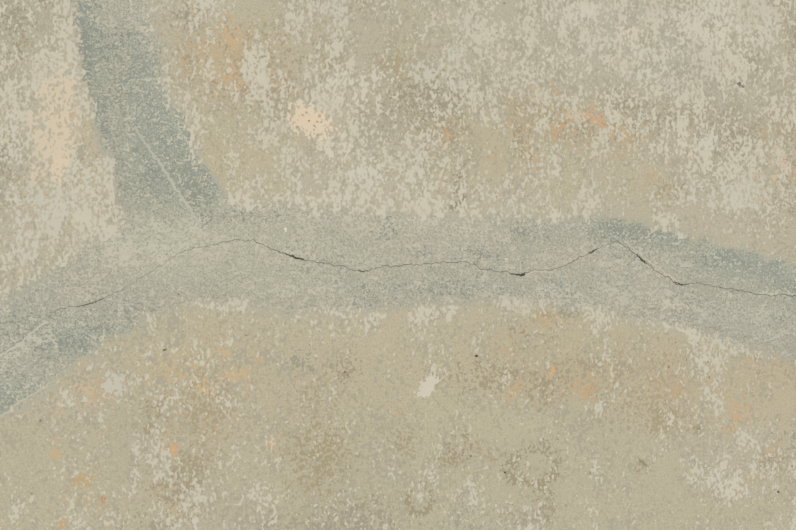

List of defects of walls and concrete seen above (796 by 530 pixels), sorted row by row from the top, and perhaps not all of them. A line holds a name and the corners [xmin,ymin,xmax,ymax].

crack [0,239,796,357]